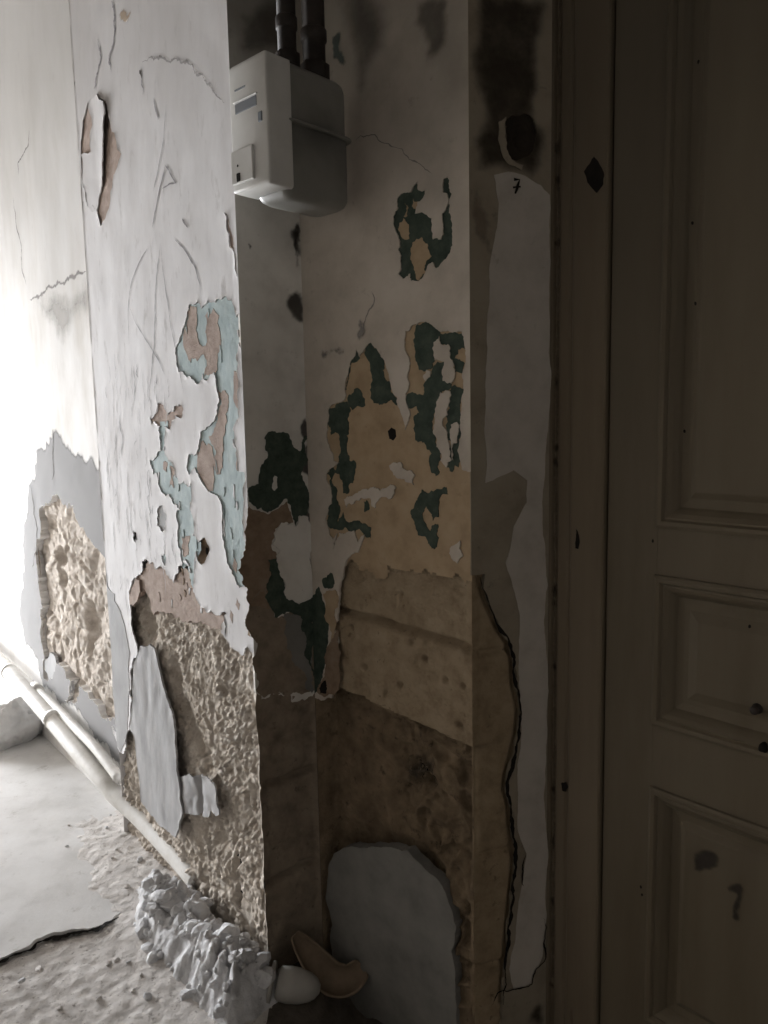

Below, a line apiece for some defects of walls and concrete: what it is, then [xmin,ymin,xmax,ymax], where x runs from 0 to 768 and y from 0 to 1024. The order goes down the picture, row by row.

peeling [81,94,121,225]
spalling [38,496,115,717]
spalling [123,172,551,1024]
crack [480,578,547,1005]